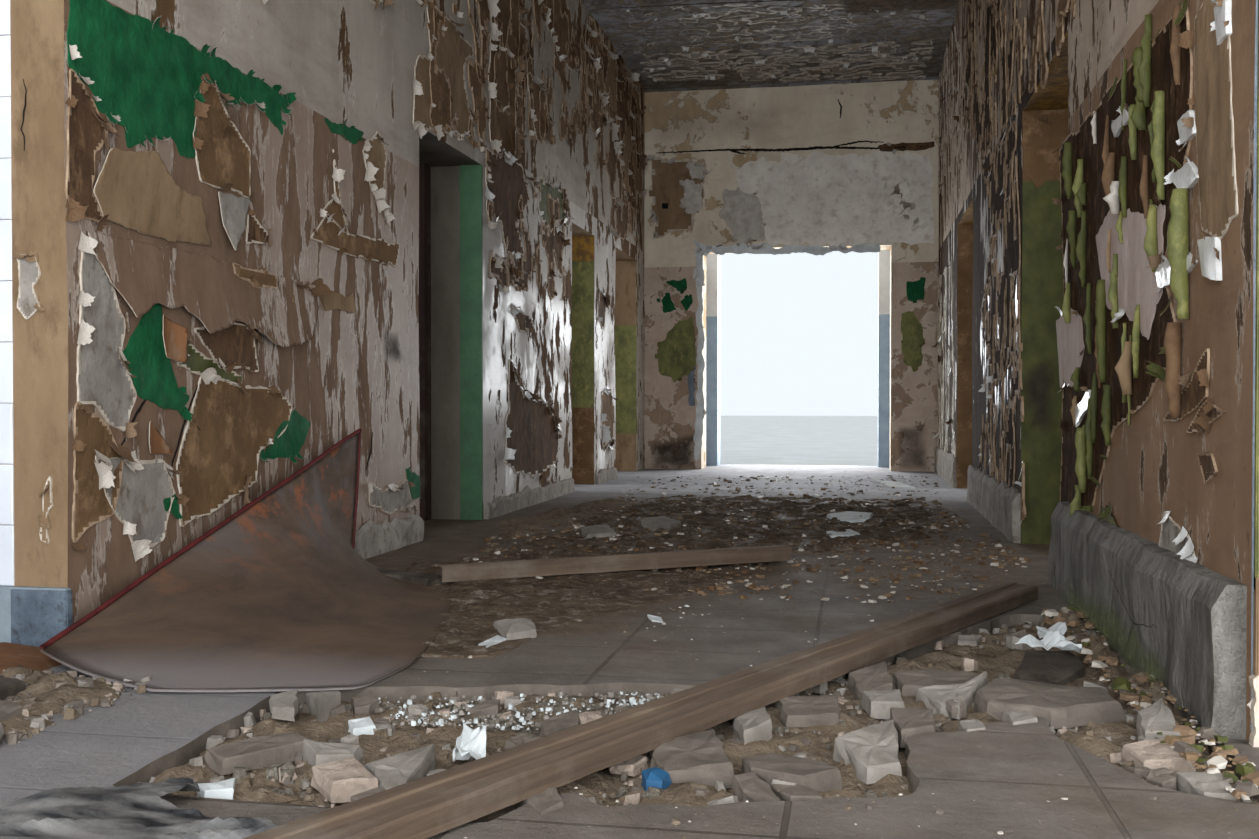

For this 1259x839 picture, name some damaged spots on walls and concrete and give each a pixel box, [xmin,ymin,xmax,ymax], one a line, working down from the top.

peeling [1210,0,1229,32]
crack [656,99,935,154]
peeling [310,119,400,267]
peeling [64,44,356,562]
peeling [412,0,1226,539]
peeling [37,476,53,543]
peeling [1156,511,1198,563]